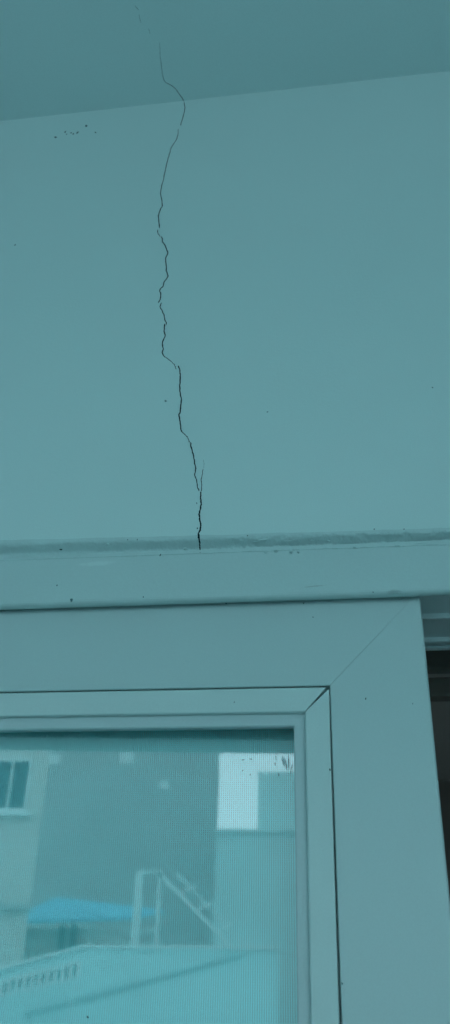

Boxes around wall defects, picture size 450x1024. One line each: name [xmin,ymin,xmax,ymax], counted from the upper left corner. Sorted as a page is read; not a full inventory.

crack [157,58,204,550]